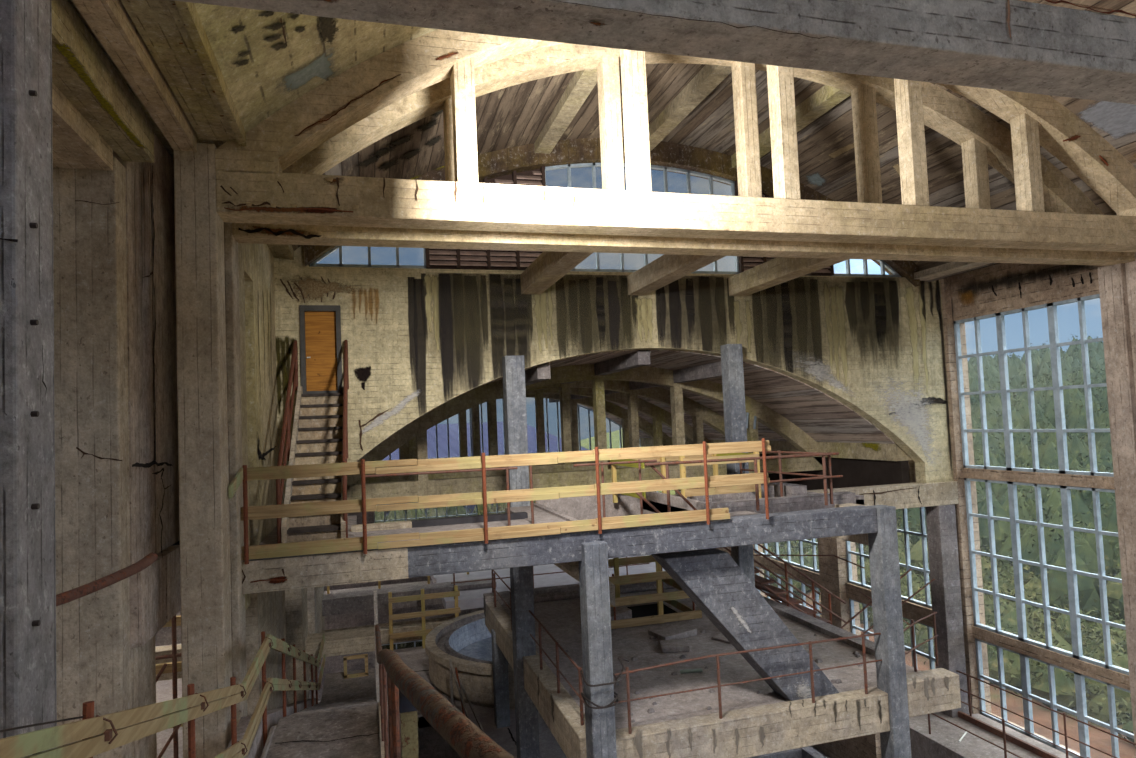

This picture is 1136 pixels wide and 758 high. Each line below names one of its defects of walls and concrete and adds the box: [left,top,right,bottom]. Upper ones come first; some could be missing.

spalling [222,201,359,214]
crack [454,181,485,206]
spalling [238,226,321,239]
water stain [352,288,379,323]
crack [76,165,172,558]
water stain [408,273,973,470]